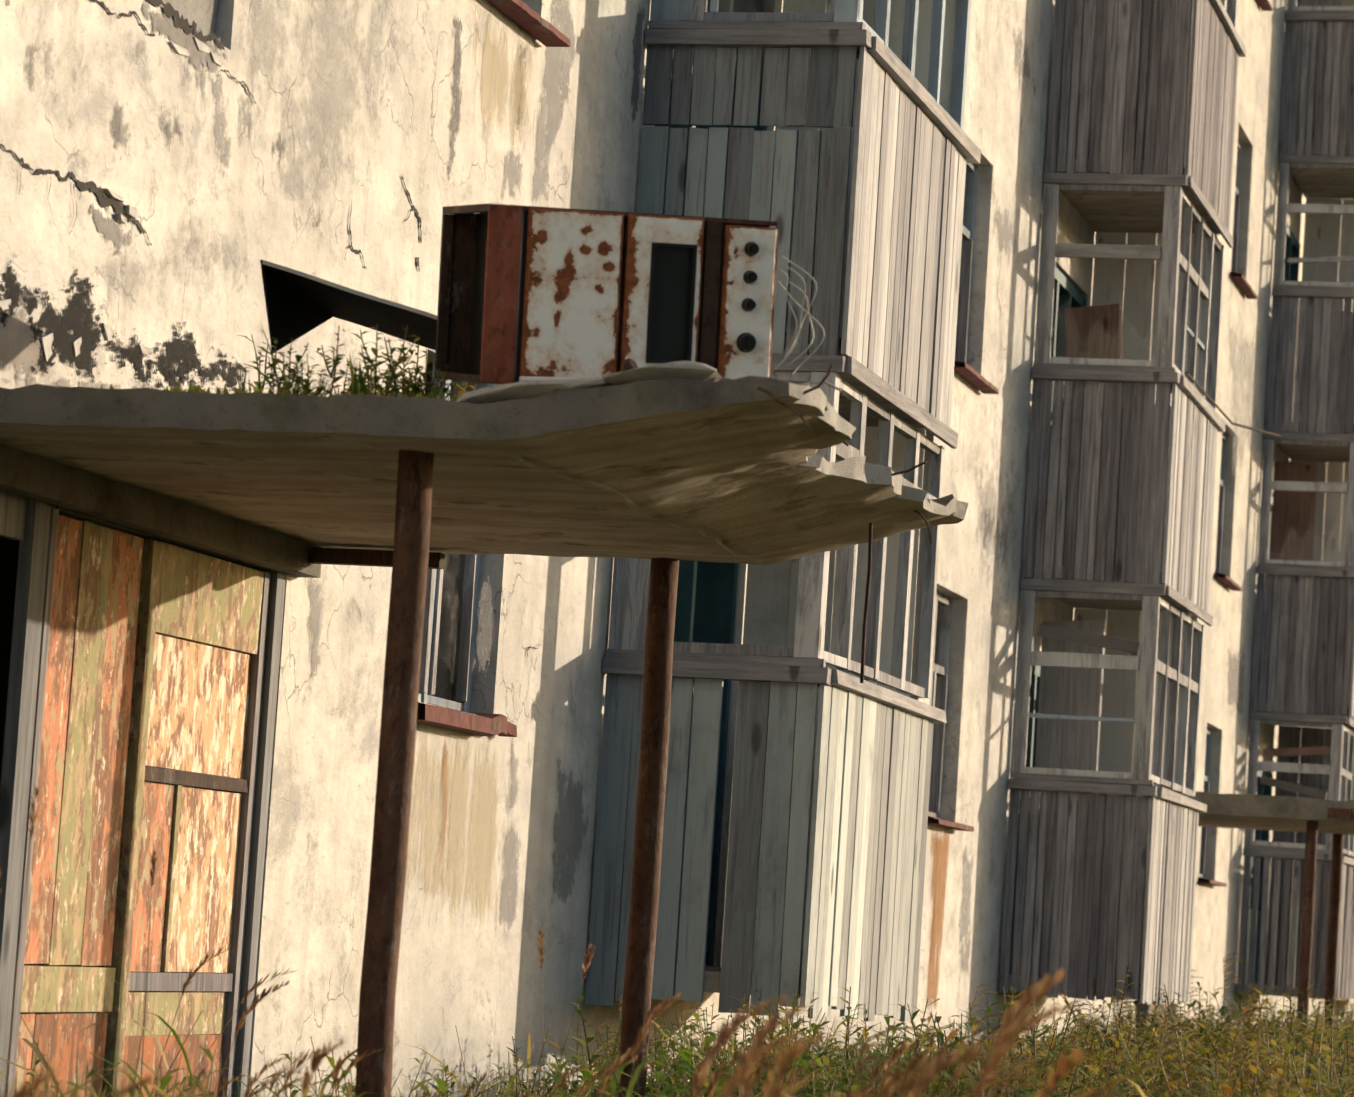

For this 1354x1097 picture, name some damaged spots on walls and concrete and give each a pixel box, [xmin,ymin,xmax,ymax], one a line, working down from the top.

crack [91,0,155,36]
crack [0,143,152,256]
spalling [803,364,843,395]
leakage [553,761,588,902]
rust [927,829,949,1008]